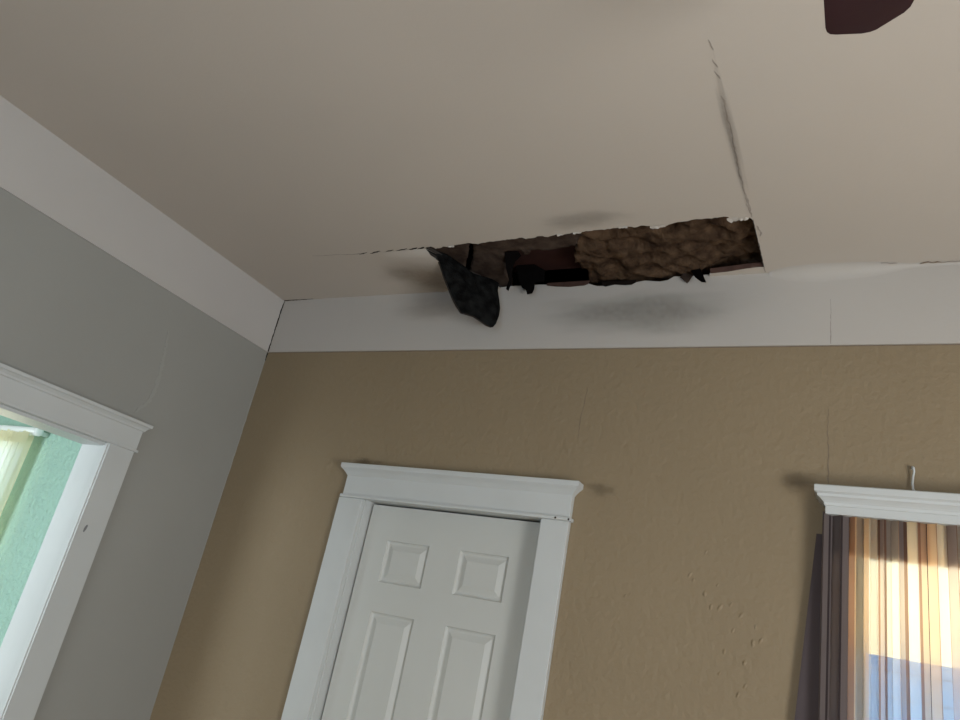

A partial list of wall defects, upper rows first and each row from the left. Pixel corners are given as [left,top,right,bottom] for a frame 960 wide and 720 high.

crack [708,40,766,272]
crack [319,247,424,256]
flaking render [557,217,762,286]